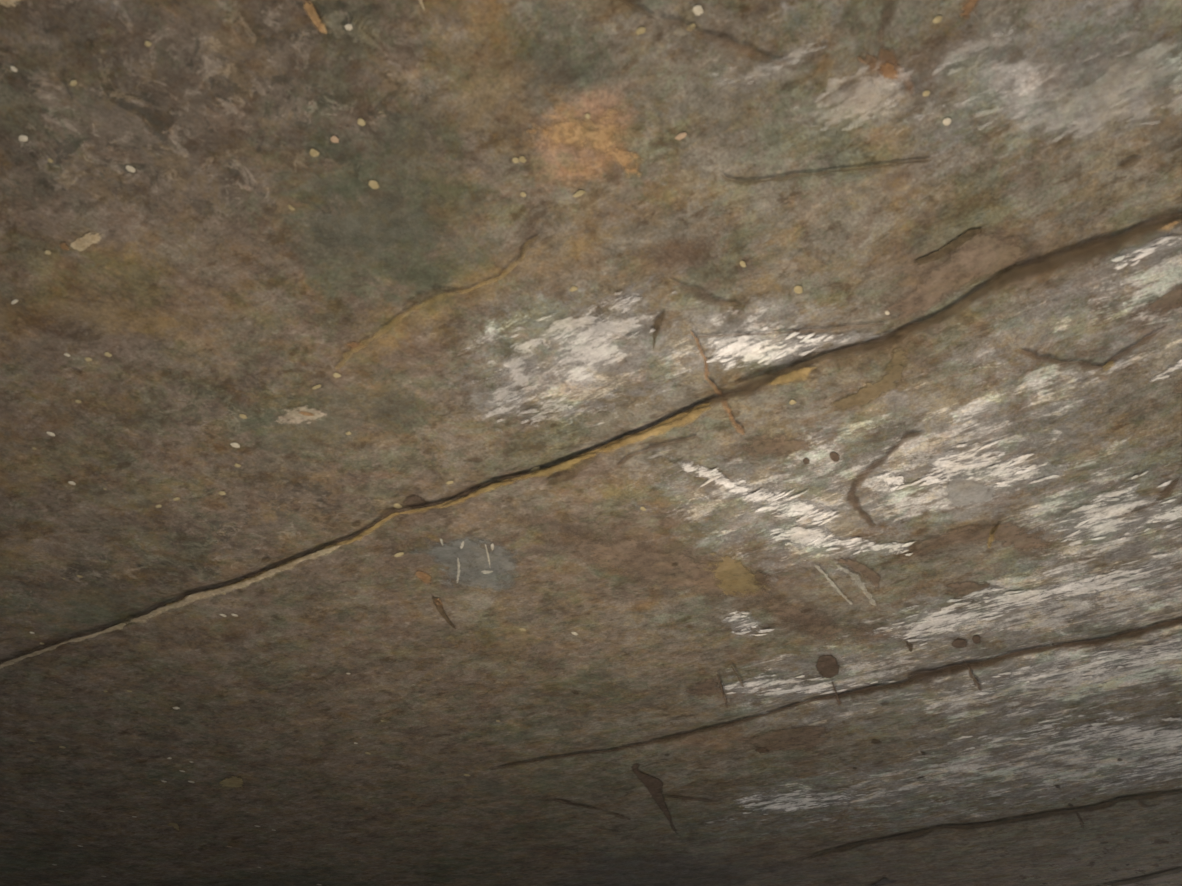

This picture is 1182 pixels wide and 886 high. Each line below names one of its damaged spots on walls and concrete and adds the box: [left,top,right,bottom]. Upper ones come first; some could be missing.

corrosion [304,1,327,34]
crack [652,312,665,348]
crack [690,331,753,435]
water stain [707,327,877,370]
crack [1021,331,1160,370]
water stain [680,462,915,556]
crack [847,433,921,526]
water stain [877,441,1062,506]
water stain [1048,471,1182,546]
crack [1117,478,1179,519]
water stain [869,554,1178,646]
water stain [722,673,896,696]